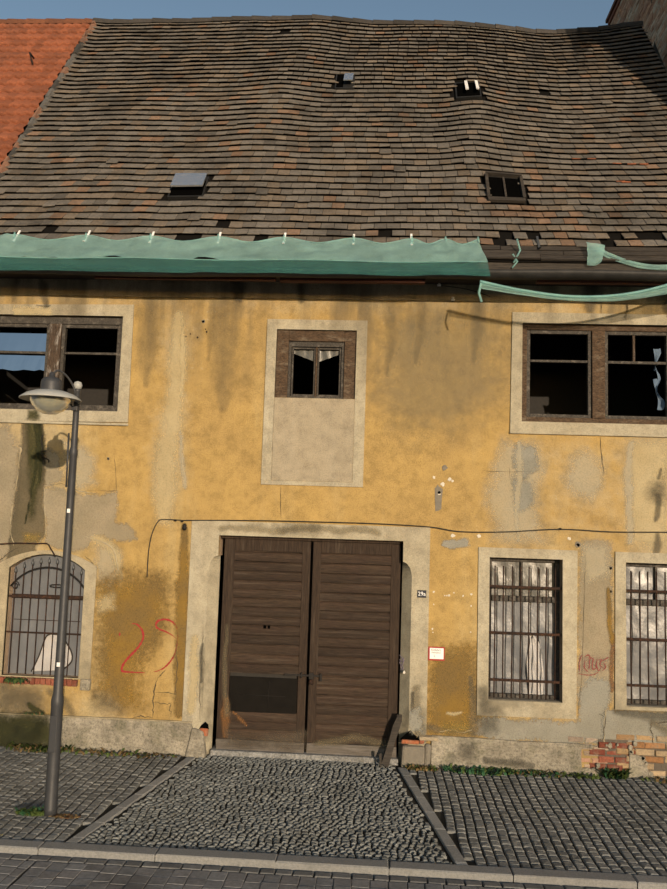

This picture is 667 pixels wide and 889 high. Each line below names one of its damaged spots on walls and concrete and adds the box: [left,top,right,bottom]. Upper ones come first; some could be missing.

leakage [7,423,45,564]
peeling [38,446,138,585]
peeling [489,442,541,541]
peeling [624,442,666,543]
crack [132,643,178,719]
flaking render [568,734,667,777]